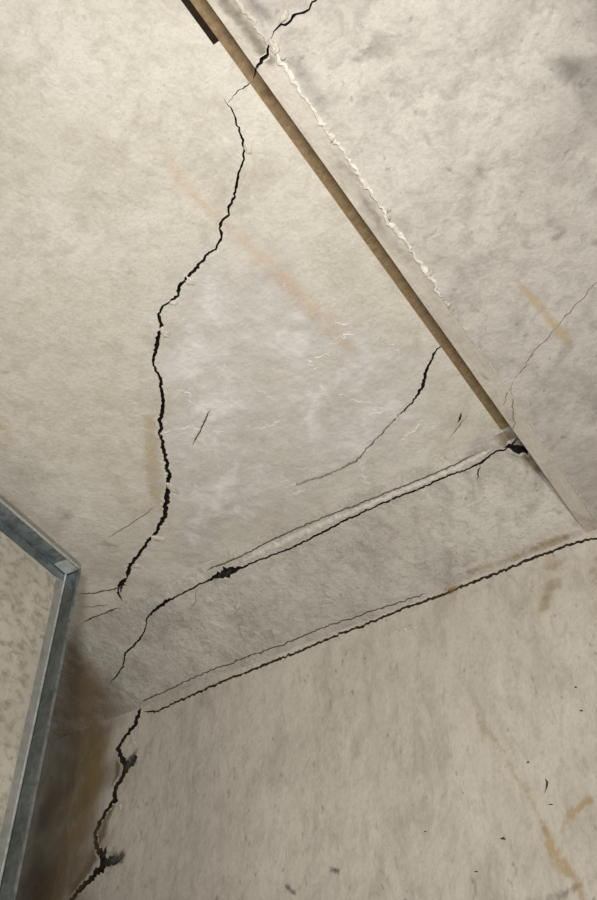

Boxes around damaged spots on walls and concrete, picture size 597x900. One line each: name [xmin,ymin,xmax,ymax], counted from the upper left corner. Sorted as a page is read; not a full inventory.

damp [34,648,113,900]
crack [81,0,317,622]
crack [69,282,597,900]